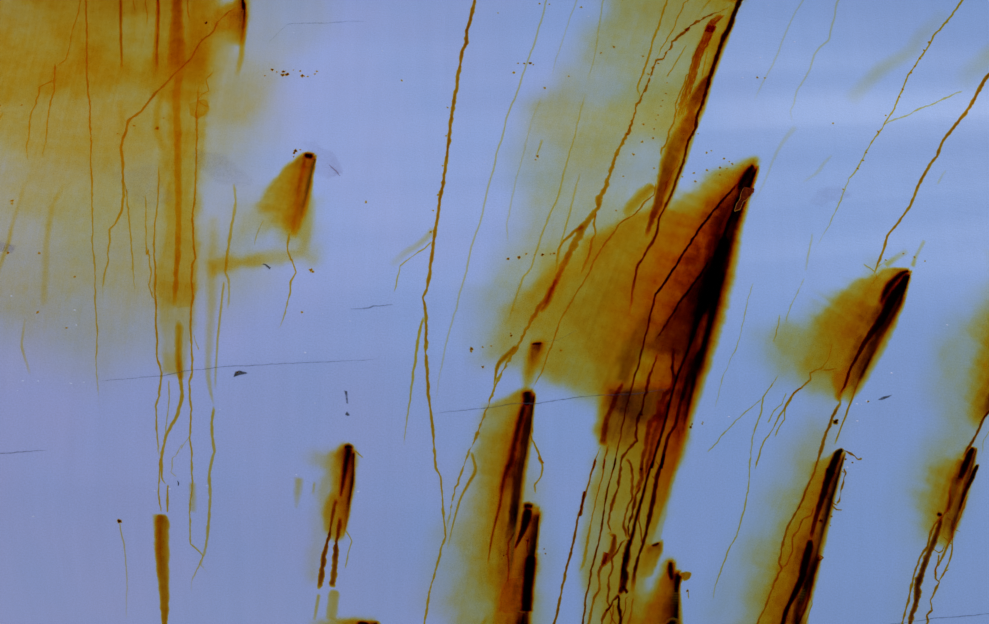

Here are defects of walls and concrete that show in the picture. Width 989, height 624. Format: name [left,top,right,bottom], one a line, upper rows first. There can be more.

corrosion [136,0,209,85]
corrosion [231,0,247,41]
corrosion [292,149,316,222]
corrosion [507,0,757,624]
corrosion [318,444,355,586]
corrosion [489,391,546,624]
corrosion [757,269,910,624]
corrosion [903,384,989,624]